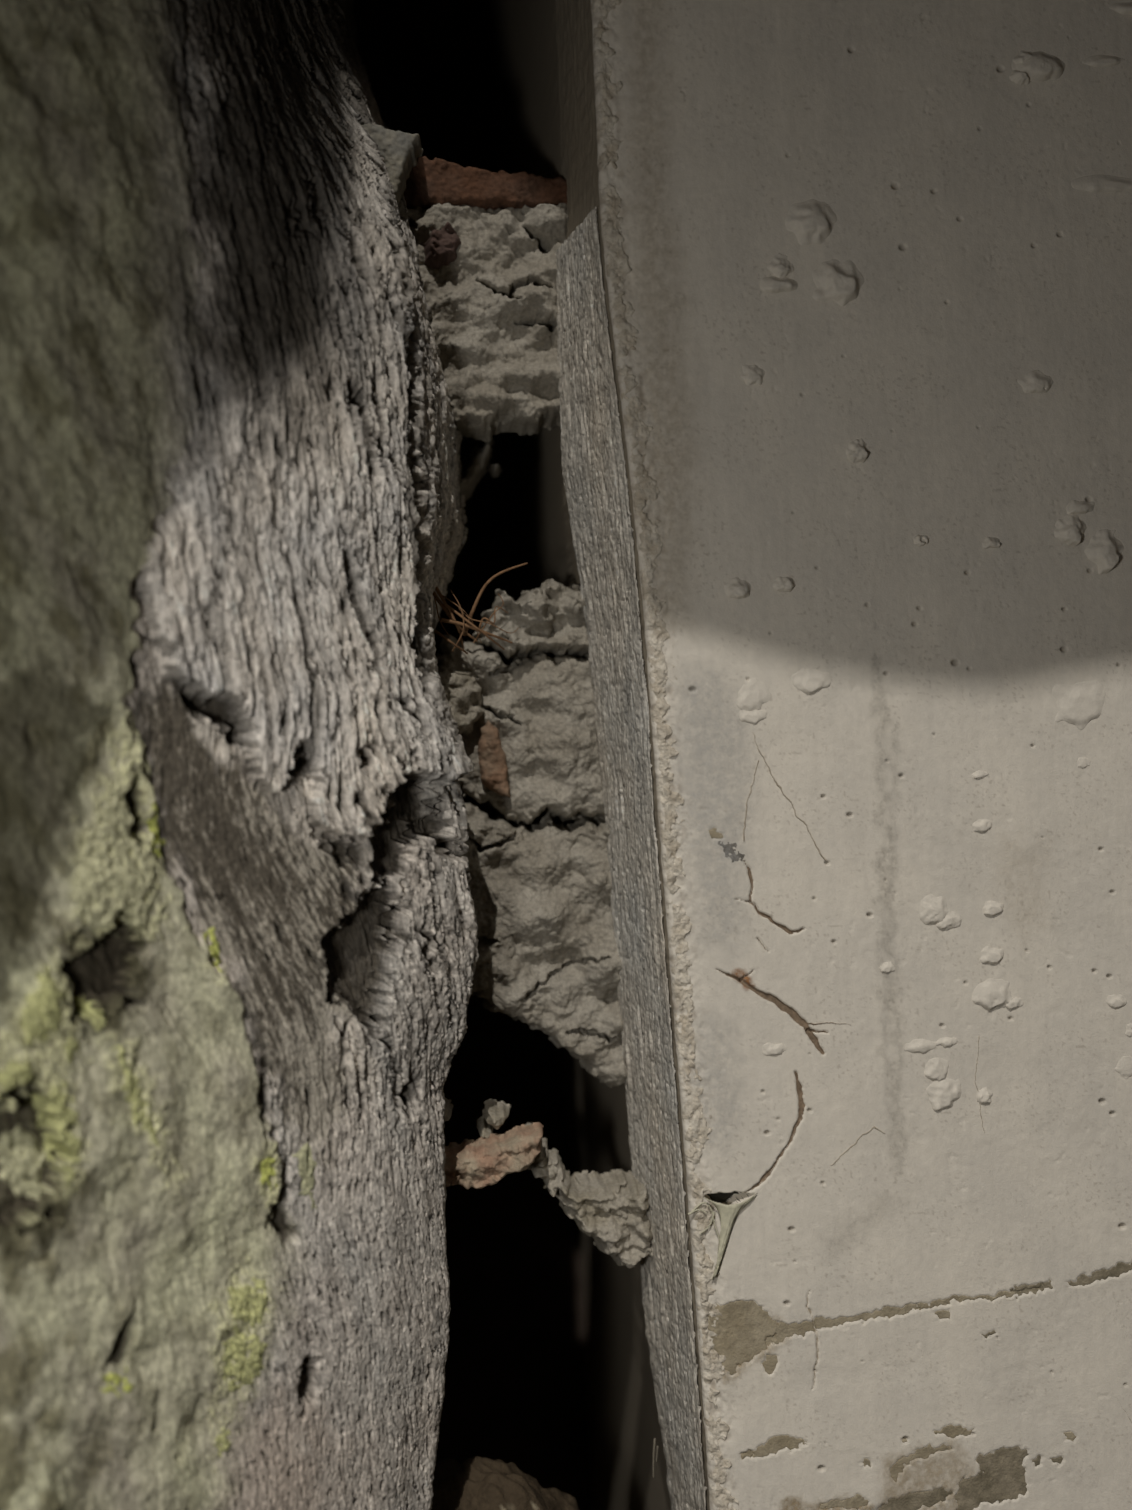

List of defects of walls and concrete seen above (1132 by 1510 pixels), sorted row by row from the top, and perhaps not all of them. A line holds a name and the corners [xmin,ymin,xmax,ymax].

crack [716,733,849,1193]
spalling [592,0,1132,1510]